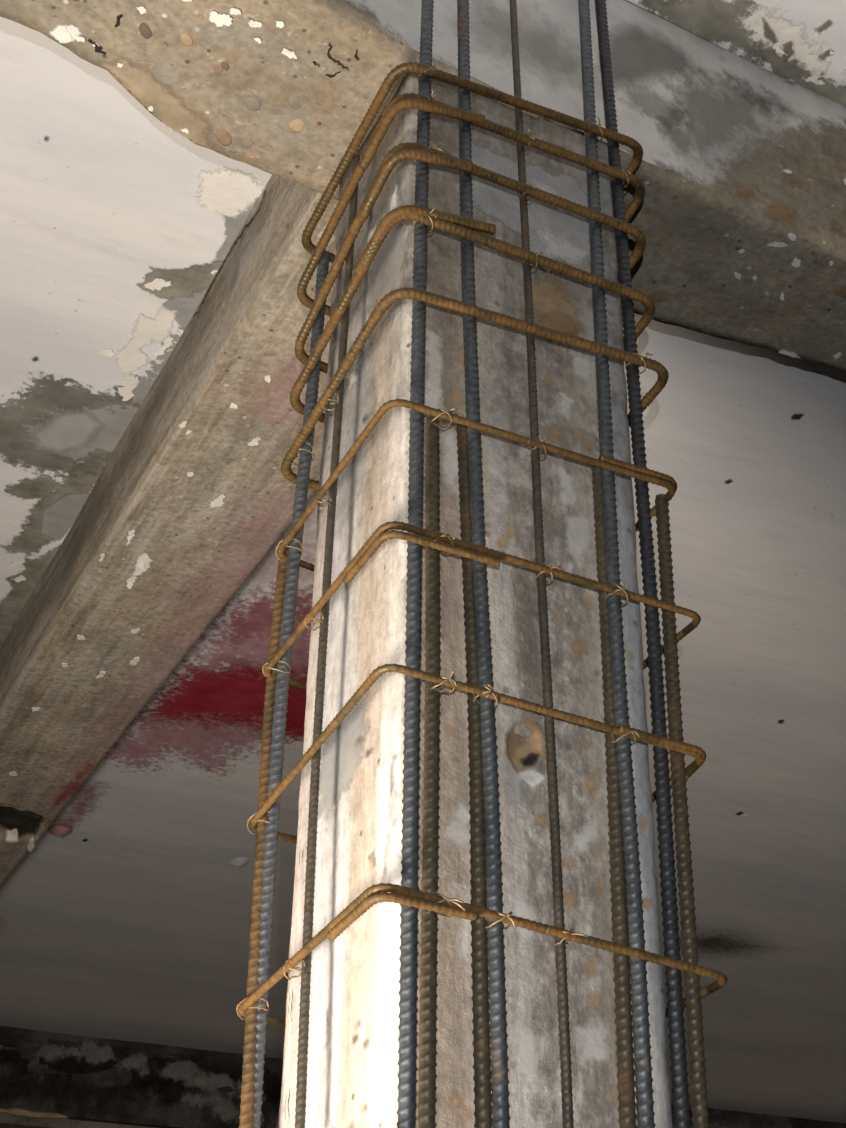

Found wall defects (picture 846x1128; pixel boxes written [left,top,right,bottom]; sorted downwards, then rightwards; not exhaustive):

spalling [641,0,846,107]
peeling [144,278,171,291]
peeling [99,307,177,401]
spalling [506,723,545,787]
spalling [0,804,49,853]
leakage [0,1044,242,1101]
leakage [262,1077,282,1107]